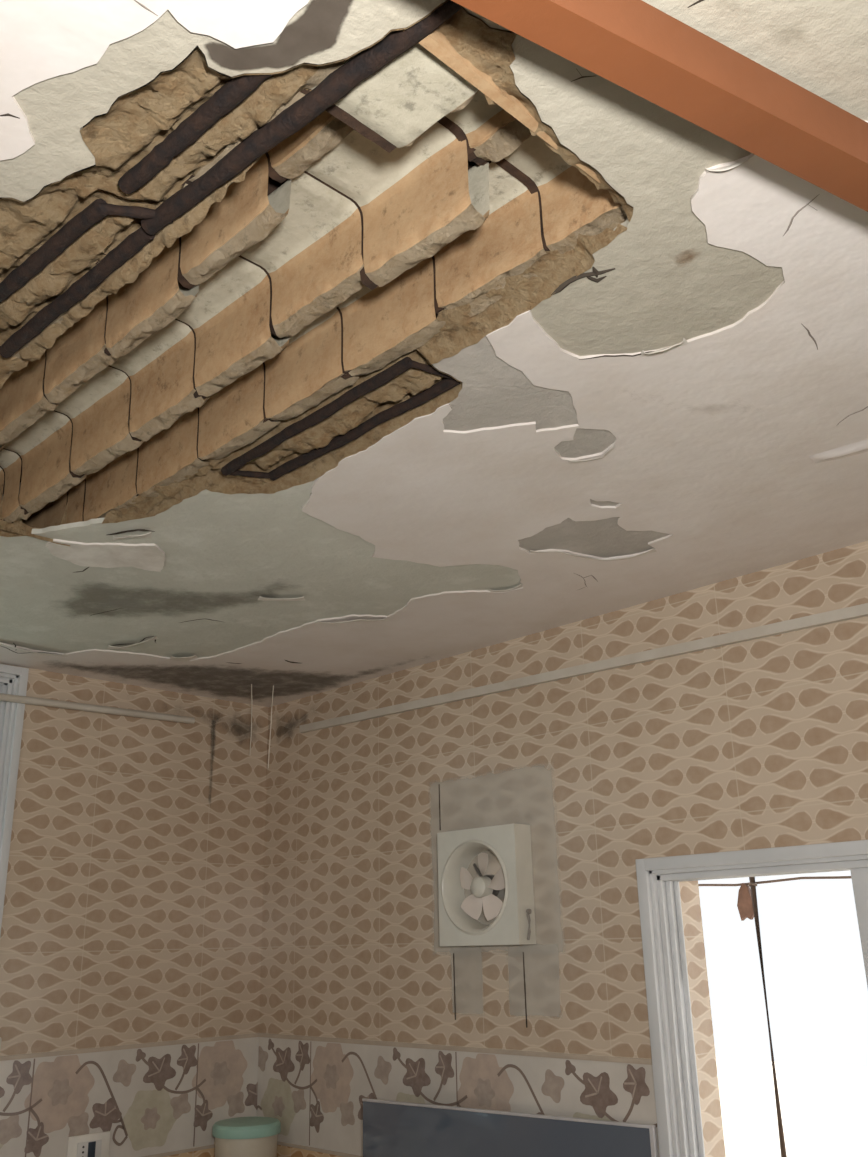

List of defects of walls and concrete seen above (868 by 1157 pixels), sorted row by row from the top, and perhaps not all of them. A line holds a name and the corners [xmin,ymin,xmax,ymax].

peeling [642,0,868,121]
peeling [0,0,784,662]
leakage [71,666,343,699]